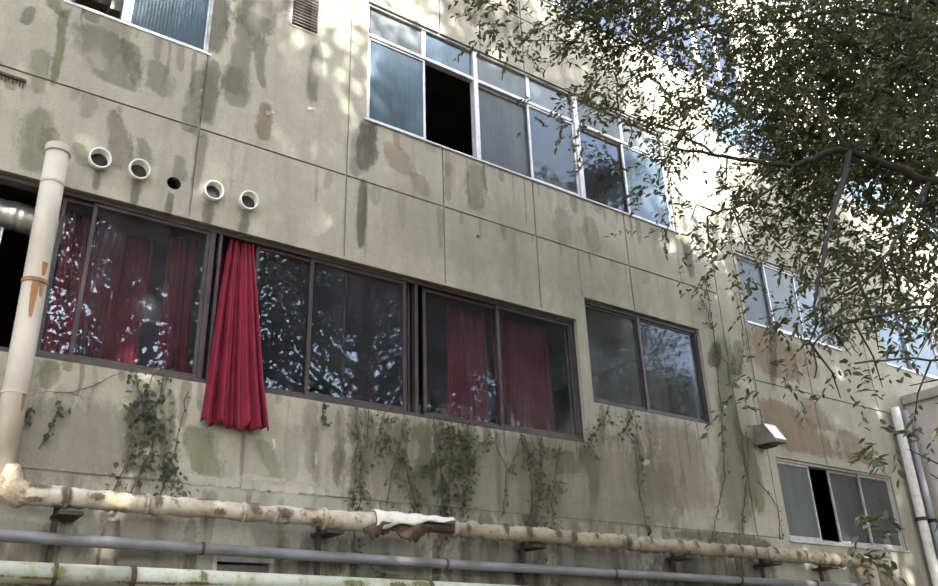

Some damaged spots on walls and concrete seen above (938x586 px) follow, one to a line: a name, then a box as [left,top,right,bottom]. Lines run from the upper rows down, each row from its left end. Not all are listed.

leakage [357,121,377,170]
leakage [357,184,367,238]
rust [29,261,48,317]
leakage [762,398,851,460]
rust [25,483,72,504]
rust [123,491,164,507]
rust [278,507,293,520]